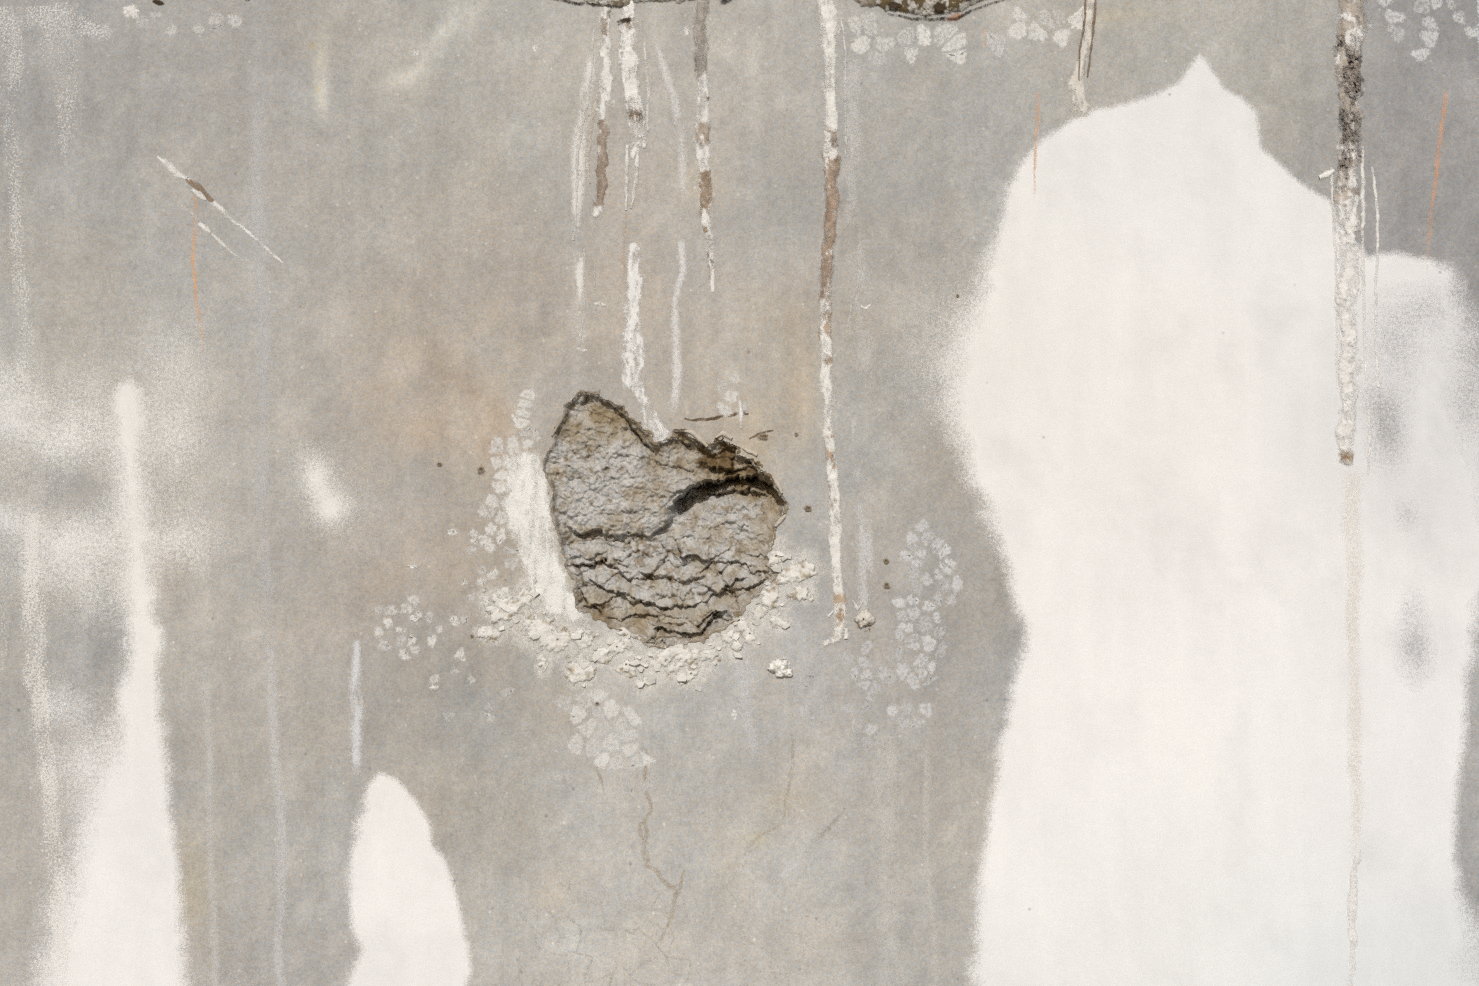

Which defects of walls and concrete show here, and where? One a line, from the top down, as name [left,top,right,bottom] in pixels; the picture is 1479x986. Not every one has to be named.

spalling [373,373,812,691]